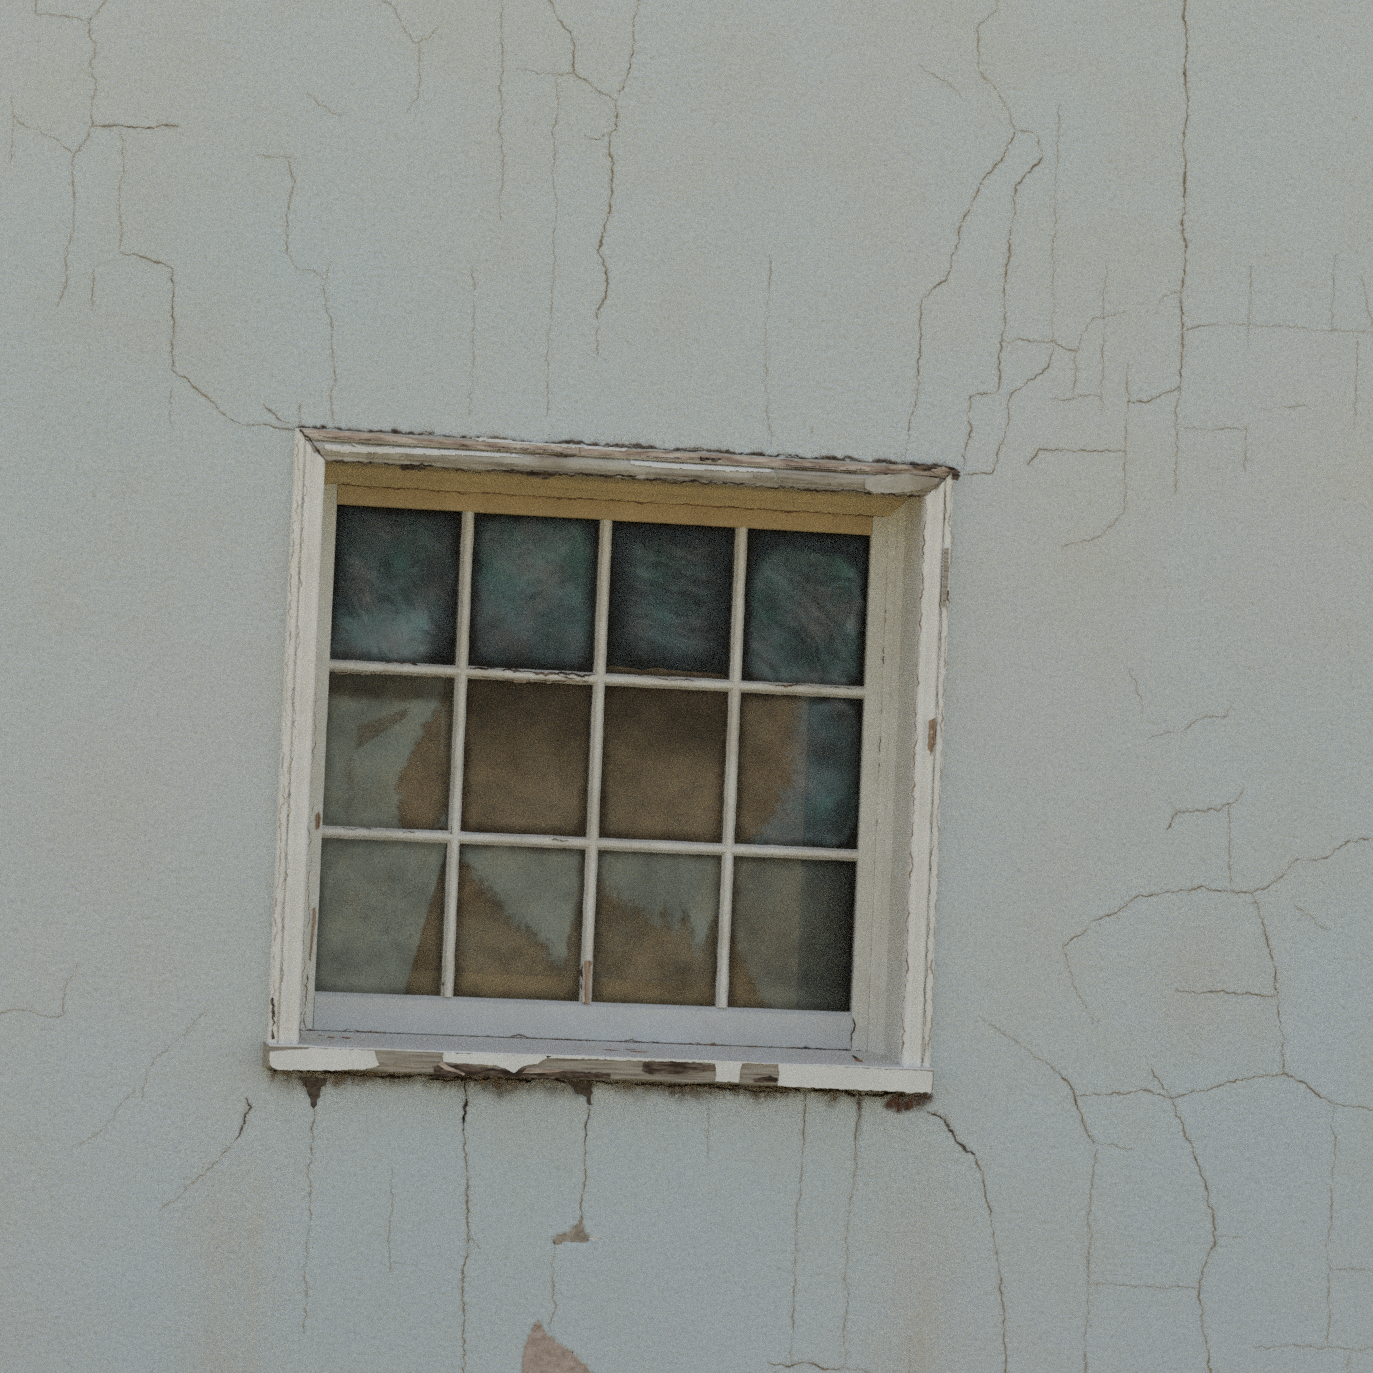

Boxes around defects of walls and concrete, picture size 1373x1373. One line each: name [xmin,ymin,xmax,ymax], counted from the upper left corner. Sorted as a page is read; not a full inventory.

crack [11,2,336,430]
crack [498,0,639,412]
crack [905,0,1373,546]
crack [461,1075,480,1373]
spalling [522,1320,590,1373]
spalling [552,1215,602,1245]
spalling [568,1080,593,1105]
crack [580,1104,590,1212]
peeling [443,1052,933,1094]
crack [770,1092,869,1373]
crack [927,1112,1007,1373]
crack [994,788,1373,1373]